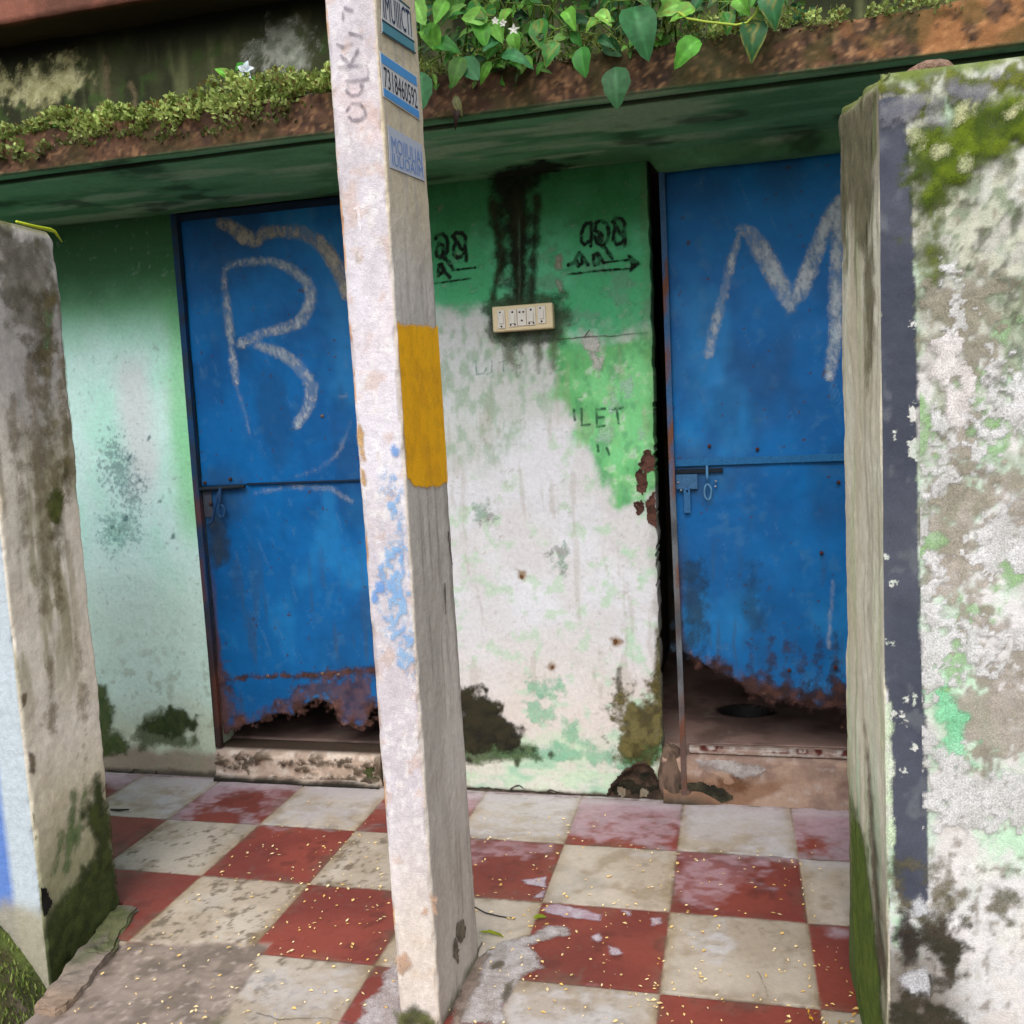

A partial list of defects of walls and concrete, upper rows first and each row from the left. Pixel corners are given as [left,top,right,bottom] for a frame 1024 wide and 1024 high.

damp [482,160,574,364]
peeling [582,333,604,370]
damp [0,226,73,613]
peeling [634,431,657,528]
peeling [885,254,1024,848]
damp [79,684,197,756]
corrosion [217,663,377,733]
damp [461,685,553,767]
damp [610,629,663,767]
corrosion [695,656,847,727]
damp [54,790,87,873]